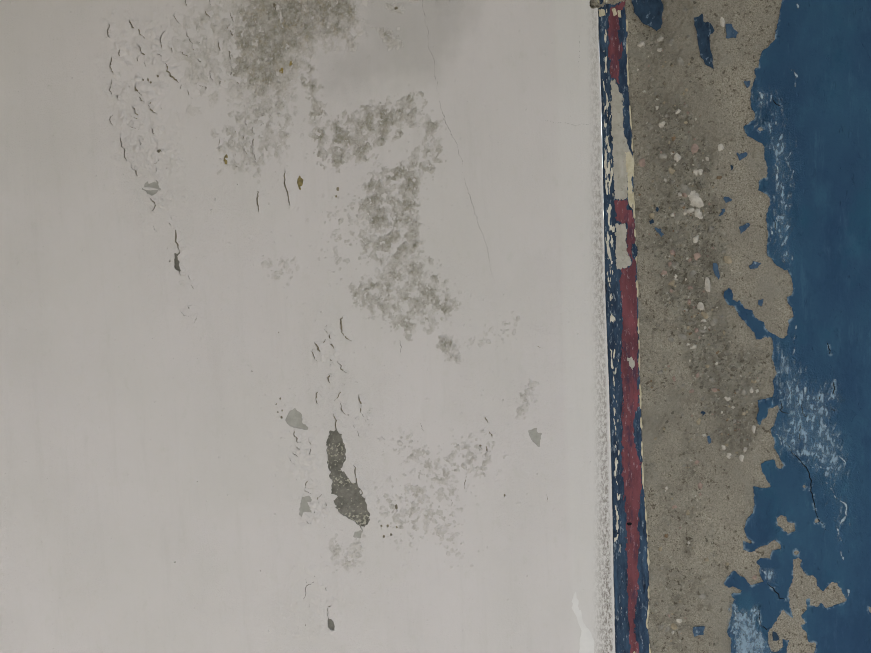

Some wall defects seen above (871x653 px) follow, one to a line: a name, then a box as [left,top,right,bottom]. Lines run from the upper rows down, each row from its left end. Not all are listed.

spalling [218,0,377,167]
peeling [325,326,343,358]
spalling [590,0,795,653]
spalling [285,408,312,431]
spalling [298,495,314,522]
peeling [326,405,380,538]
crack [779,382,835,531]
peeling [326,587,339,631]
spalling [768,550,846,653]